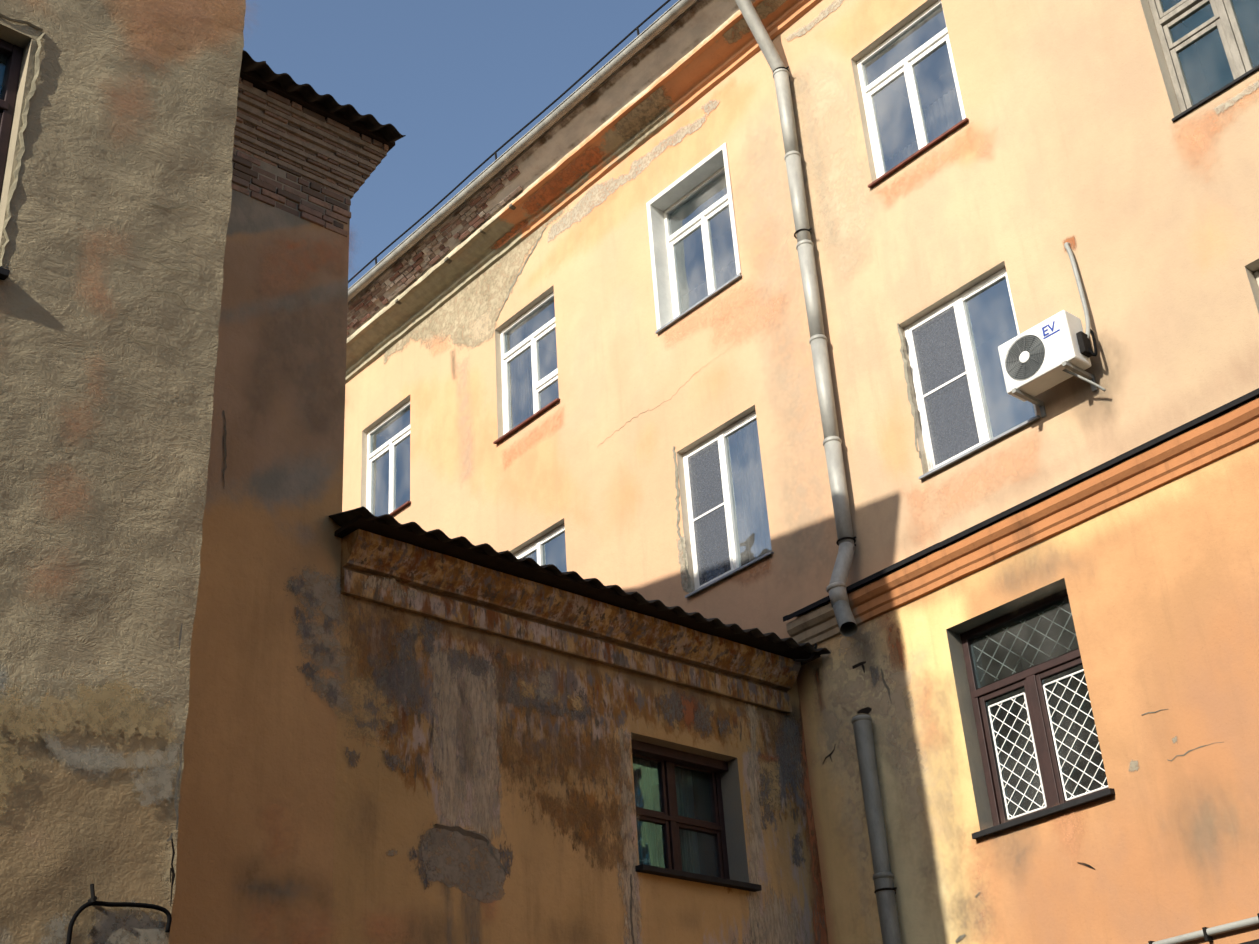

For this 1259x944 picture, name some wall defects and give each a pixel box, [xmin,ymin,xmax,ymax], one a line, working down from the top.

peeling [723,0,786,44]
flaking render [384,86,720,363]
peeling [677,537,692,592]
peeling [0,674,179,815]
crack [167,744,182,906]
flaking render [388,824,513,903]
peeling [88,907,167,944]